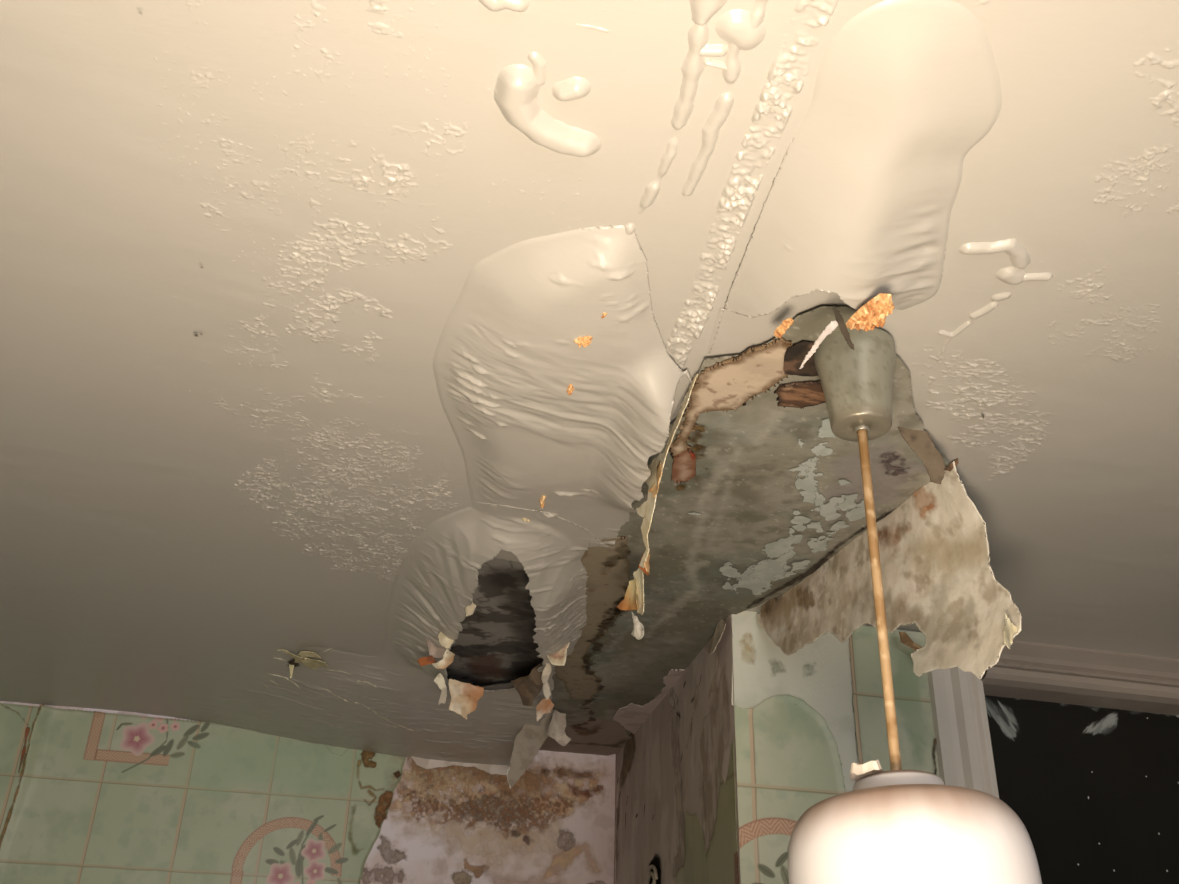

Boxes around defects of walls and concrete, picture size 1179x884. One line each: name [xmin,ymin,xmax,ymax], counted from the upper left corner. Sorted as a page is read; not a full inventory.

spalling [845,293,894,332]
spalling [774,318,819,377]
peeling [671,448,696,484]
damp [690,425,705,460]
damp [881,454,907,476]
damp [572,587,628,735]
flaking render [706,611,882,790]
damp [671,655,728,876]